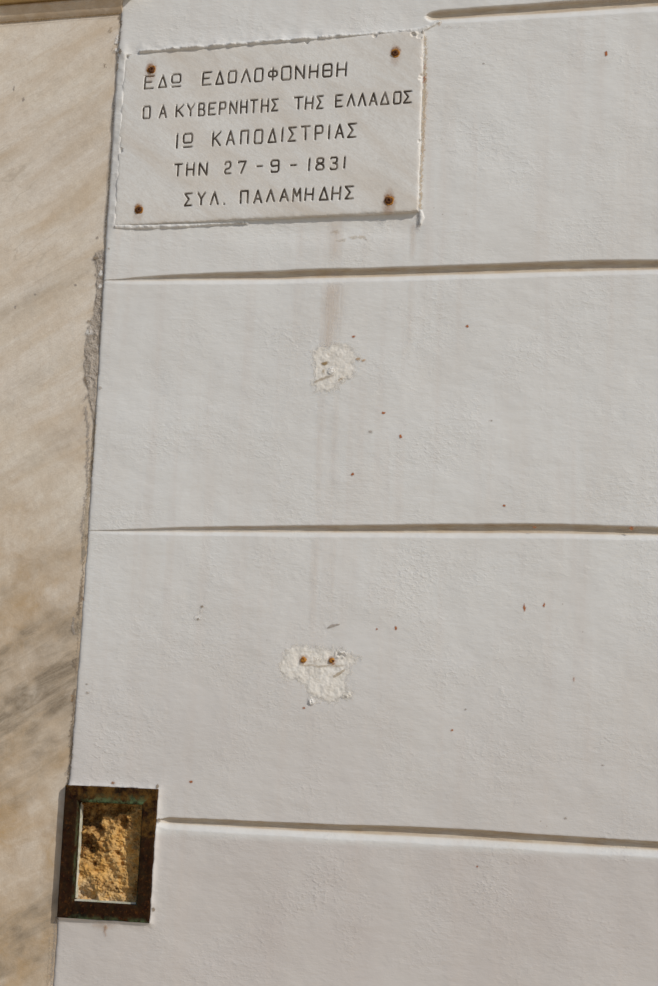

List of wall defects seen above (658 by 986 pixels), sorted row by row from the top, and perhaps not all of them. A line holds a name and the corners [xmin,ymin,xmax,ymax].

flaking render [311,344,365,392]
flaking render [279,645,358,704]